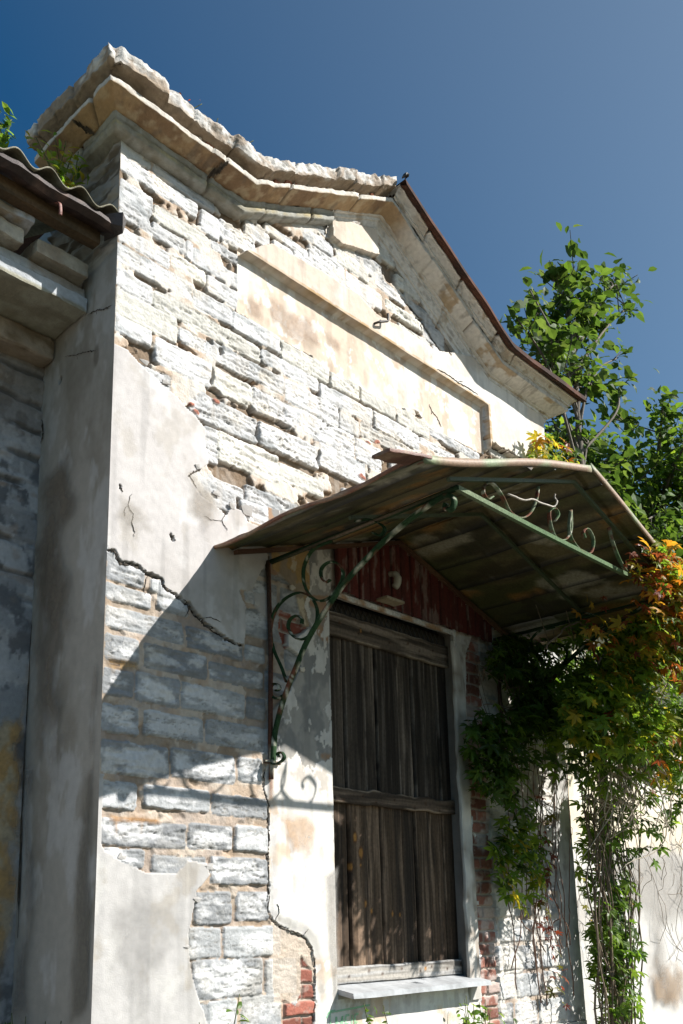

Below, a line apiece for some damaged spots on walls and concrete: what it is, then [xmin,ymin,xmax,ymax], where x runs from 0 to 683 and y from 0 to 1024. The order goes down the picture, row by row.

flaking render [114,140,515,526]
crack [107,484,242,647]
flaking render [99,544,316,1024]
crack [263,772,316,1024]